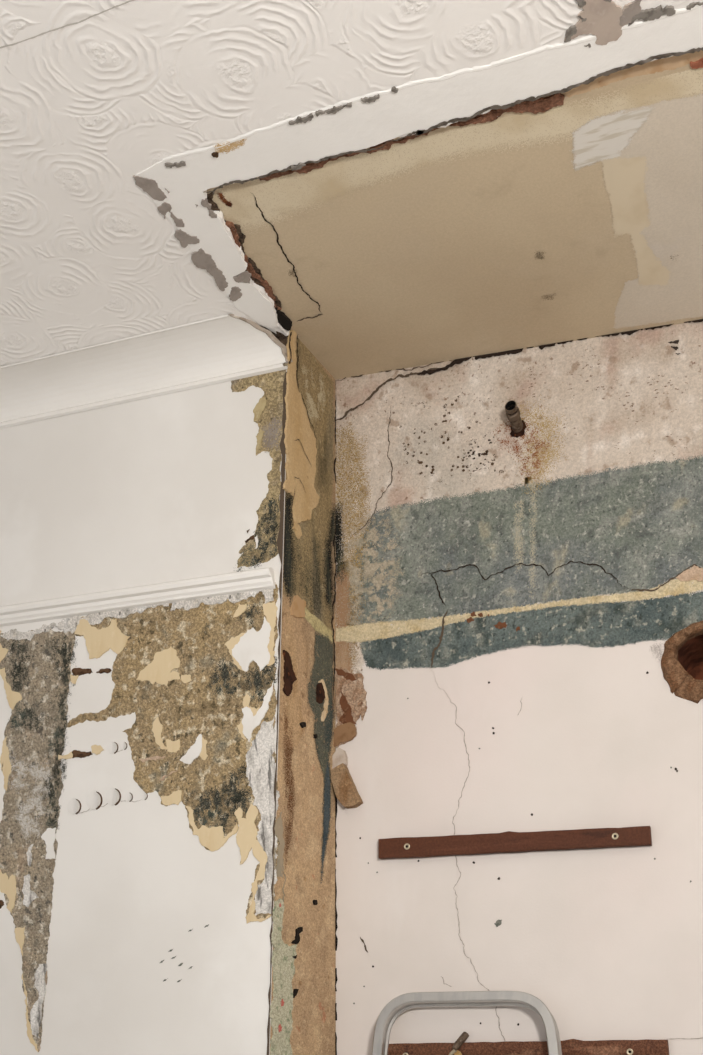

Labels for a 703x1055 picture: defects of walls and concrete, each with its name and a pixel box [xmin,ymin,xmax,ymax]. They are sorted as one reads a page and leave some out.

crack [0,0,135,48]
peeling [564,0,703,48]
peeling [289,86,398,125]
peeling [133,175,251,301]
crack [254,196,323,321]
crack [336,319,703,536]
rust [493,394,571,499]
flaking render [334,321,703,748]
flaking render [0,583,276,641]
water stain [234,338,373,883]
peeling [67,788,148,814]
crack [417,561,701,1042]